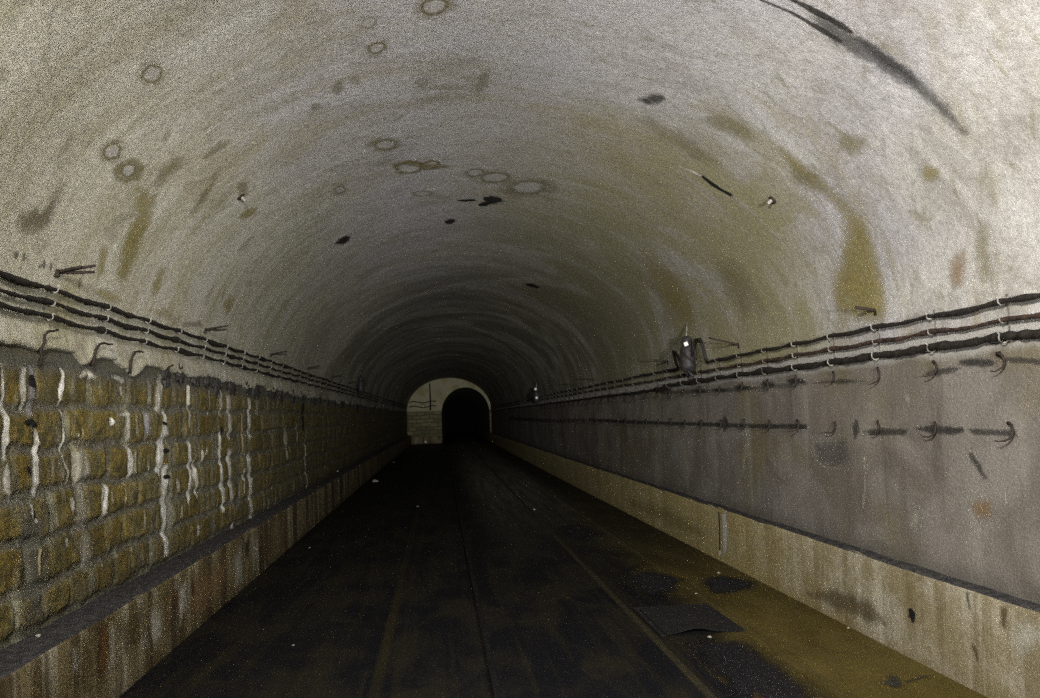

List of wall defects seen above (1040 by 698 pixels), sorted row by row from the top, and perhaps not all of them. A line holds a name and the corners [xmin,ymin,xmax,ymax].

damp [103,142,144,182]
damp [393,160,445,174]
damp [120,192,153,277]
damp [0,369,10,459]
damp [20,367,42,609]
damp [57,367,89,527]
damp [99,378,253,556]